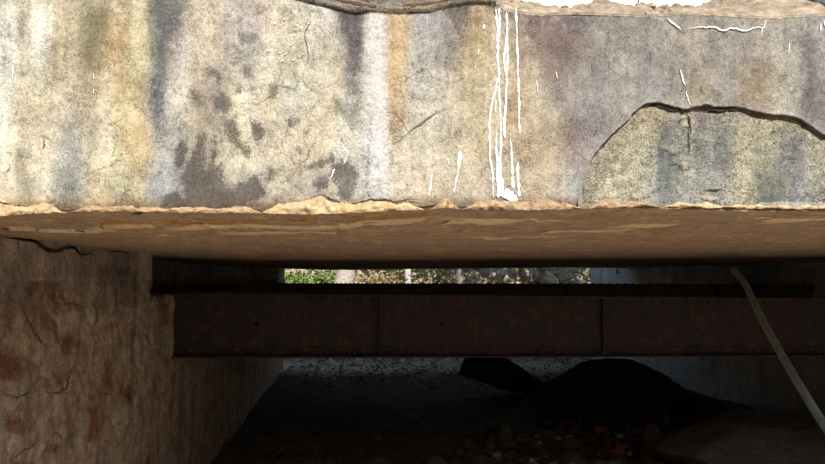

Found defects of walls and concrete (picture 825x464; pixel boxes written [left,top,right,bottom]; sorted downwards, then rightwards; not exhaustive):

crack [668,18,767,35]
leakage [492,6,521,201]
leakage [160,118,269,209]
spalling [0,99,825,237]
crack [4,237,129,256]
peeling [470,224,676,240]